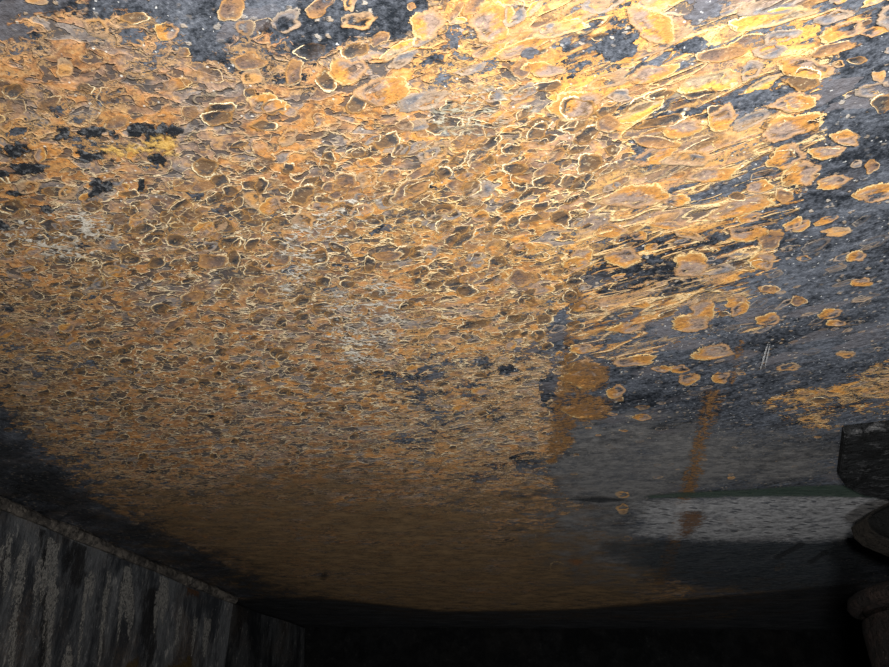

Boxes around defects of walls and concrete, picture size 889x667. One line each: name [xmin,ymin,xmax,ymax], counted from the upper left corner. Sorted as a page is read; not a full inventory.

corrosion [217,0,245,21]
corrosion [305,0,333,19]
corrosion [341,0,377,30]
corrosion [843,70,889,114]
corrosion [829,129,859,147]
corrosion [816,175,853,190]
corrosion [850,159,889,203]
corrosion [782,216,839,232]
corrosion [820,227,852,237]
corrosion [651,365,700,386]
corrosion [676,312,780,504]
corrosion [757,359,889,439]